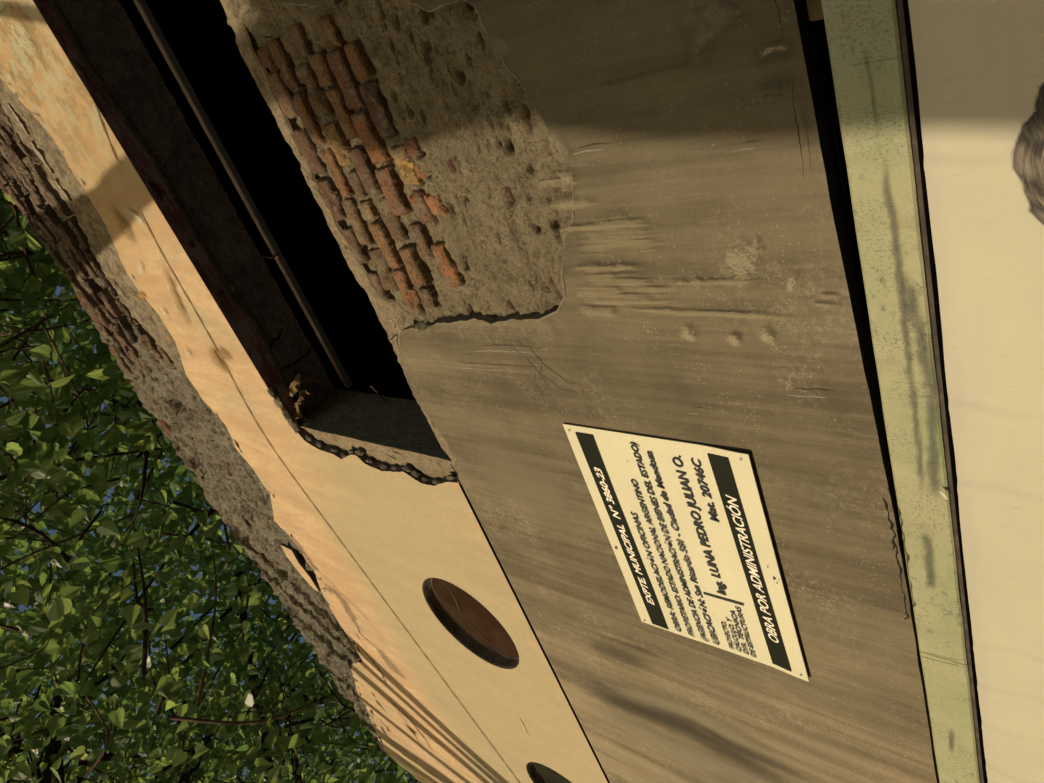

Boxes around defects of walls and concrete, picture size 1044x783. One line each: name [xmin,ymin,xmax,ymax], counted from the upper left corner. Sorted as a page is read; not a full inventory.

spalling [227,0,574,364]
crack [792,76,804,179]
spalling [0,73,384,751]
spalling [267,385,462,485]